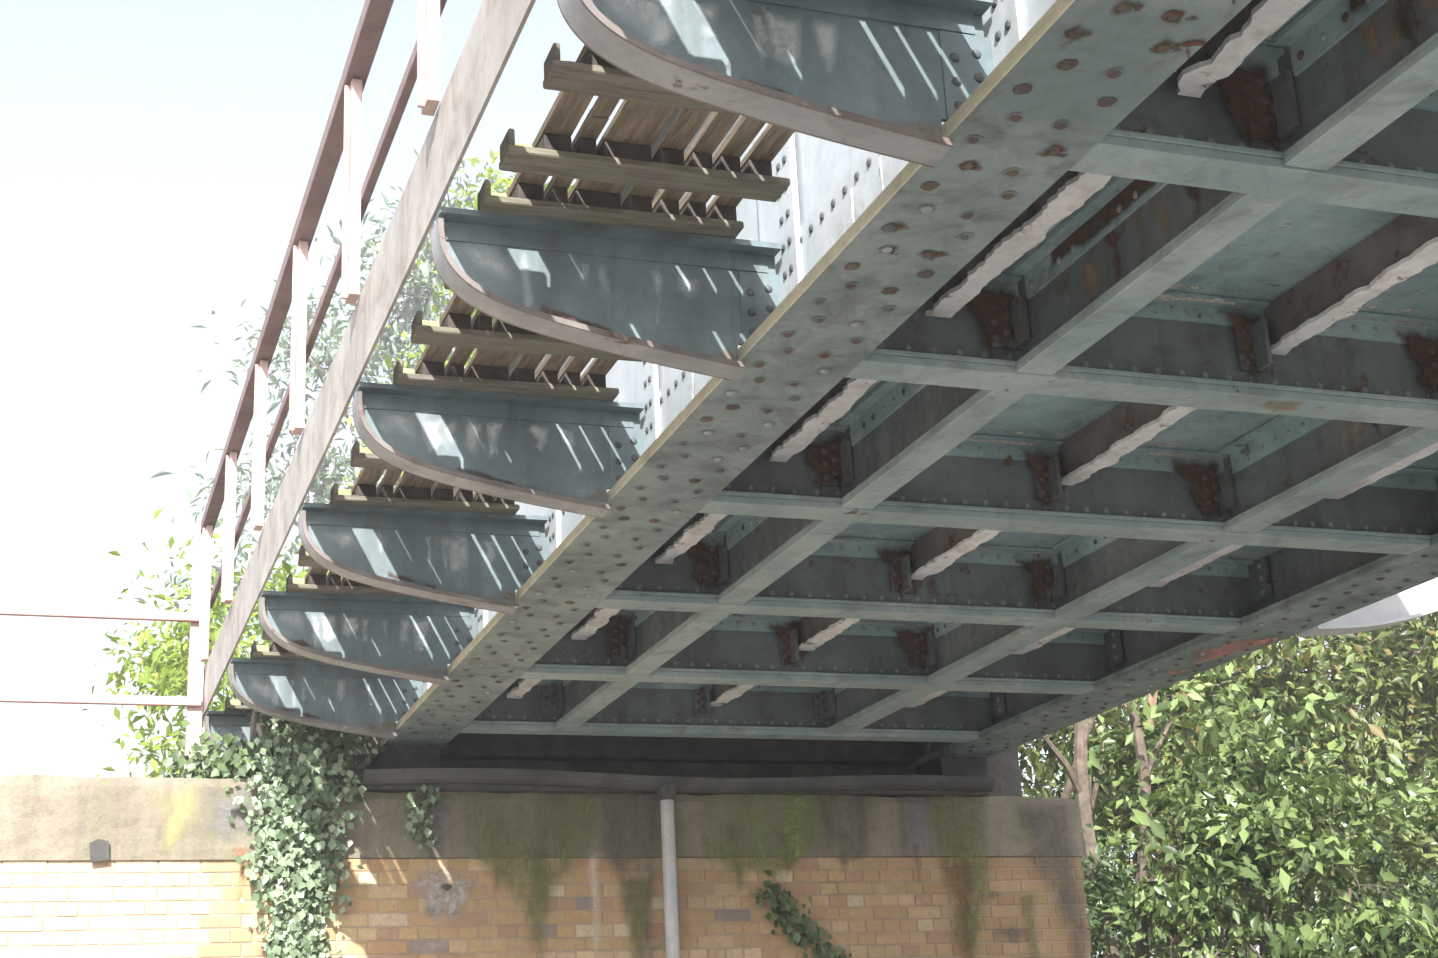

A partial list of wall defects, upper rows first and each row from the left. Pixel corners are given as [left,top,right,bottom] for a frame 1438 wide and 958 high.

corrosion [1152,40,1207,58]
corrosion [1217,65,1278,148]
corrosion [1187,186,1200,202]
corrosion [1051,179,1155,277]
corrosion [968,288,1016,357]
corrosion [1399,334,1438,399]
corrosion [1174,462,1221,517]
corrosion [601,616,632,664]
corrosion [770,621,807,666]
corrosion [897,630,928,669]
spalling [419,871,470,917]